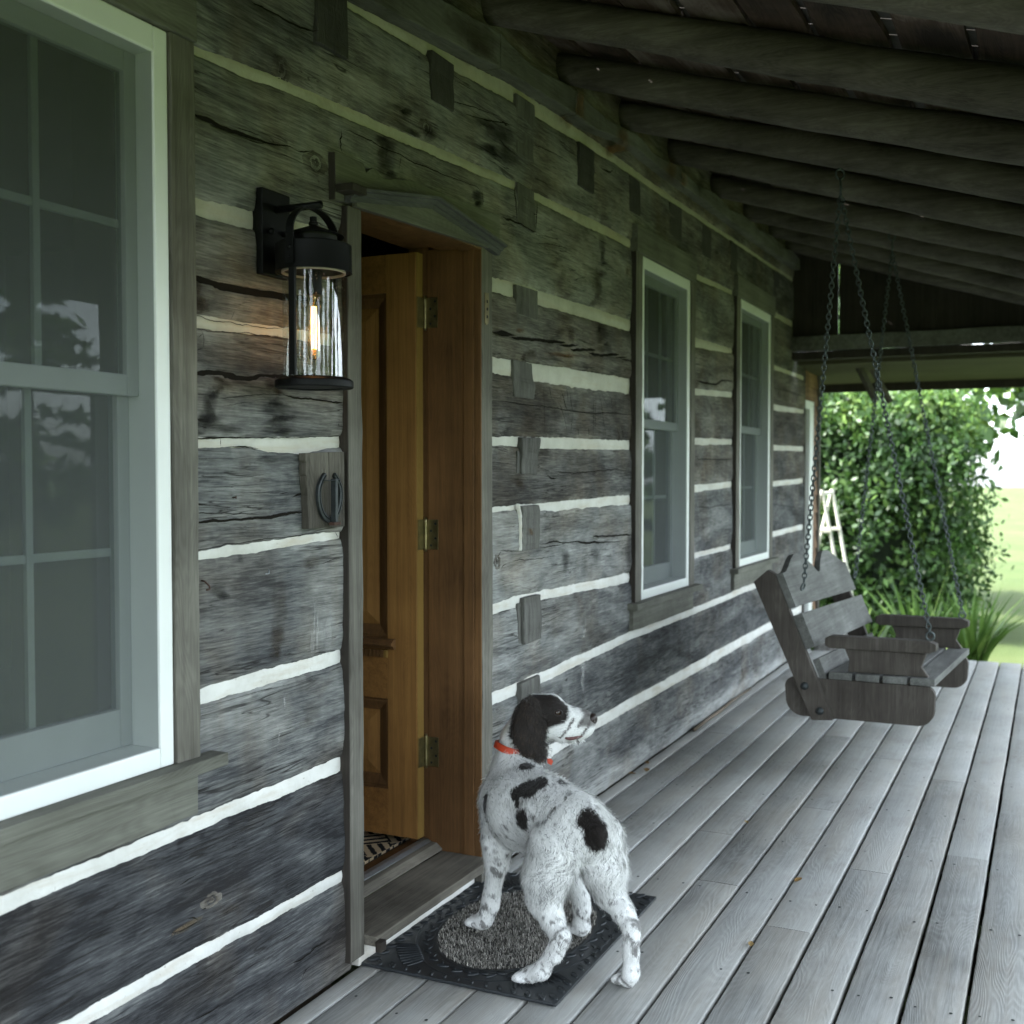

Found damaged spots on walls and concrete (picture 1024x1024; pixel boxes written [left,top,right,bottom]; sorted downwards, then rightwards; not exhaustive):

crack [195,114,309,153]
crack [196,275,343,406]
crack [493,330,631,361]
crack [199,475,341,564]